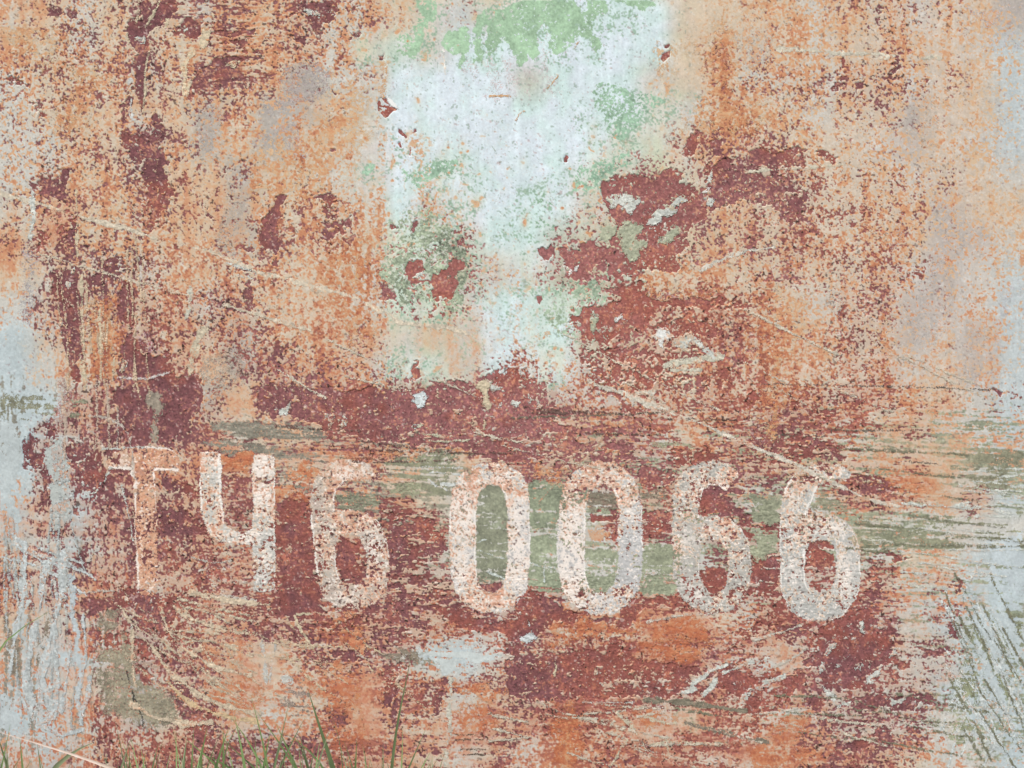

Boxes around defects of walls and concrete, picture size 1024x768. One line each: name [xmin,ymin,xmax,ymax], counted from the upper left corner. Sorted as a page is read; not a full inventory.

rust [248,56,395,208]
rust [318,236,380,349]
peeling [380,282,397,301]
peeling [405,231,468,302]
peeling [538,133,837,414]
peeling [257,360,734,488]
rust [743,281,816,448]
peeling [274,499,429,642]
rust [305,604,373,756]
peeling [316,648,365,667]
rust [453,678,510,734]
rust [546,614,720,665]